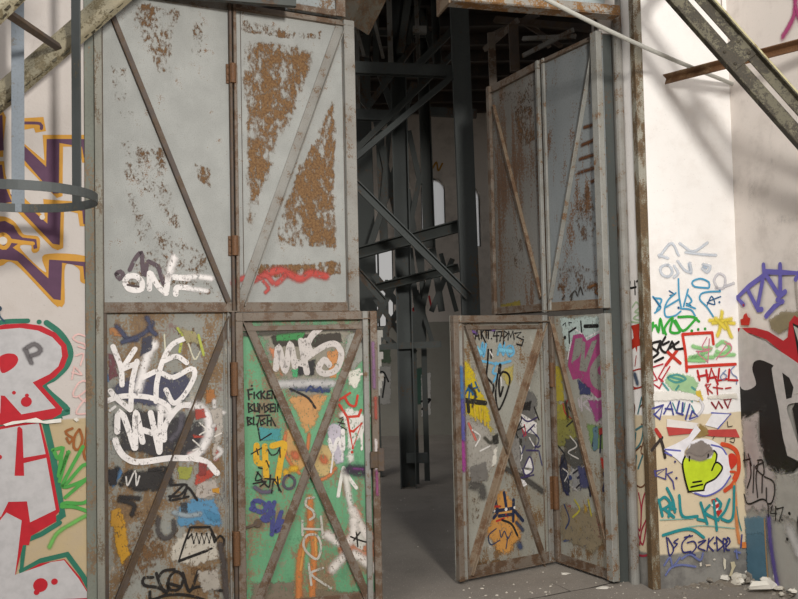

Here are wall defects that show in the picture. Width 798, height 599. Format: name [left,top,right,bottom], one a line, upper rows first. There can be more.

corrosion [135,4,180,72]
corrosion [241,20,311,203]
corrosion [124,141,180,228]
corrosion [195,164,211,186]
corrosion [278,104,336,248]
corrosion [576,139,596,240]
corrosion [147,233,207,285]
corrosion [557,267,598,295]